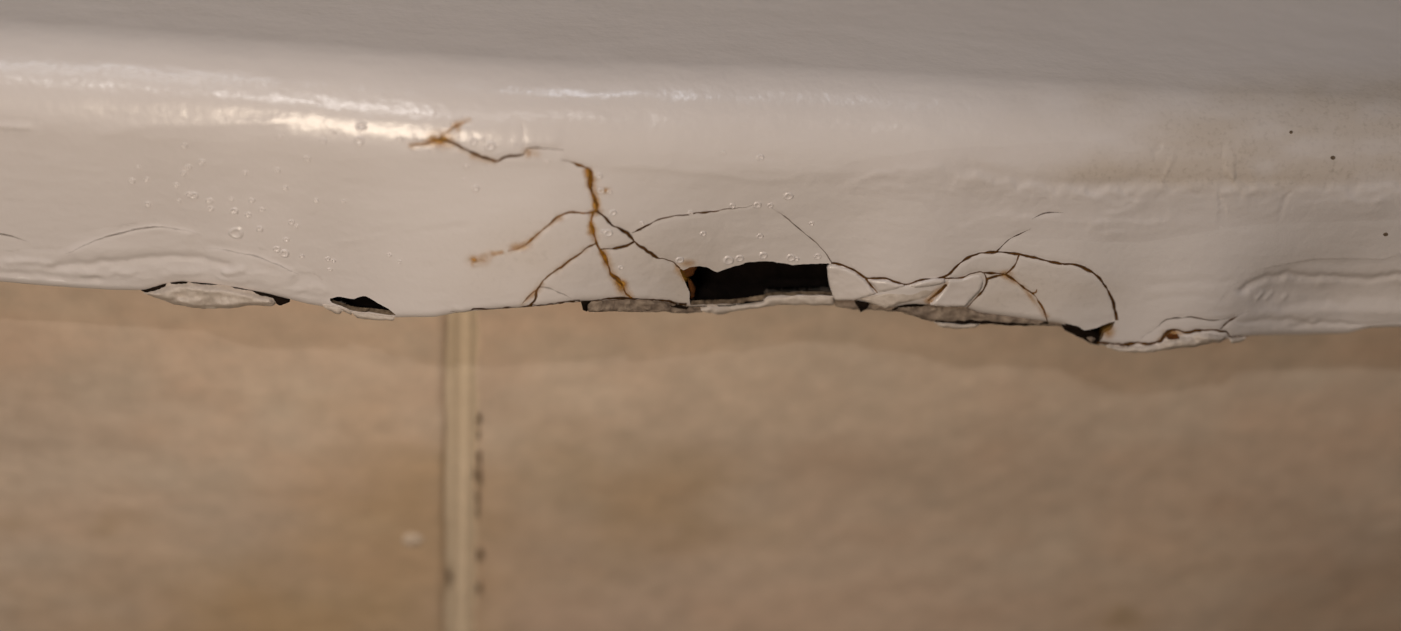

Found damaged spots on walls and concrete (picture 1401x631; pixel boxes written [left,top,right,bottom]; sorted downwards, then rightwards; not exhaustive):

corrosion [585,169,607,234]
crack [420,138,1249,347]
peeling [141,281,290,309]
spalling [322,296,395,321]
spalling [450,261,1246,353]